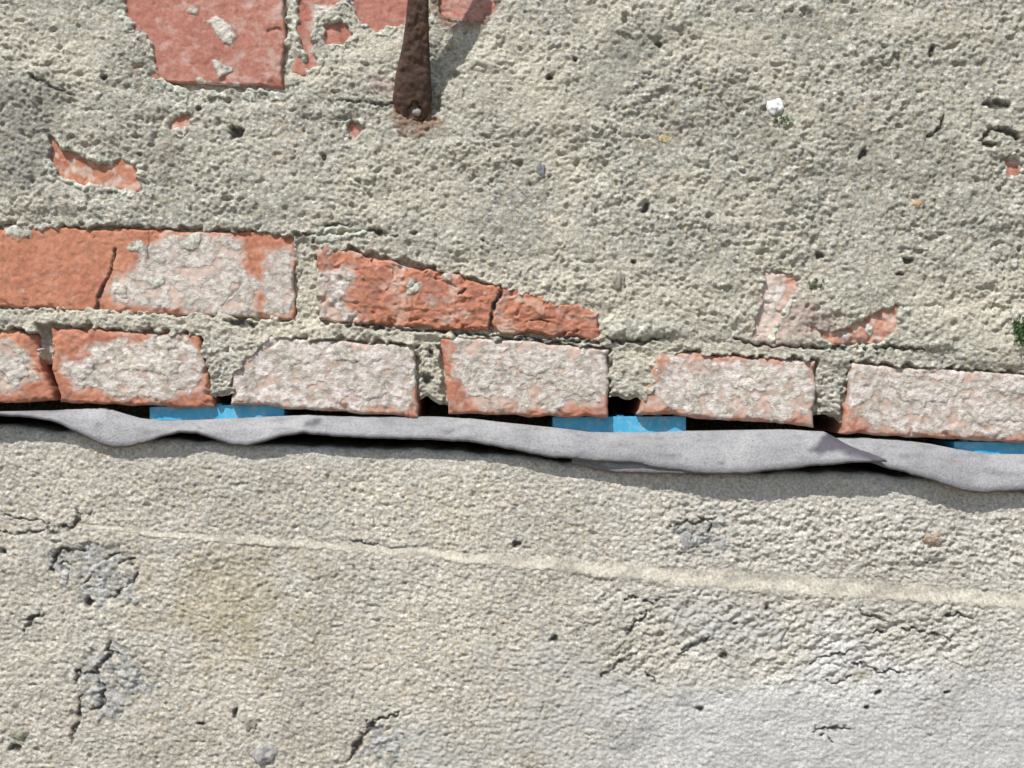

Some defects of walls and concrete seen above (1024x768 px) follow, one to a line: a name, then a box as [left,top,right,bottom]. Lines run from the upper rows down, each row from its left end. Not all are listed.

spalling [117,0,136,33]
peeling [187,5,236,47]
spalling [146,59,294,137]
spalling [39,129,136,198]
peeling [2,225,31,237]
crack [97,249,117,310]
peeling [111,232,432,413]
spalling [752,261,796,343]
crack [0,513,81,572]
spalling [48,542,139,613]
spalling [78,640,158,721]
crack [823,652,899,684]